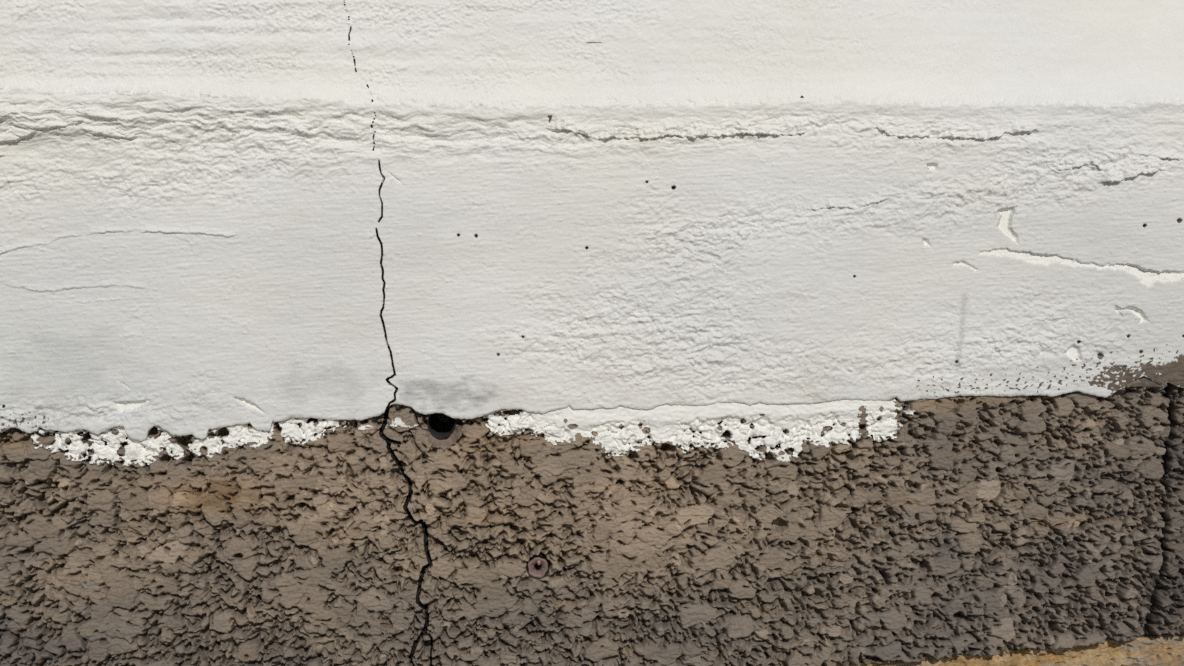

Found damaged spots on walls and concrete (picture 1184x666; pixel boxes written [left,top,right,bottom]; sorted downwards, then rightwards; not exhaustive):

peeling [1115,305,1150,323]
crack [344,0,433,666]
peeling [916,343,1184,397]
peeling [113,379,150,413]
peeling [0,412,54,449]
spalling [426,426,463,451]